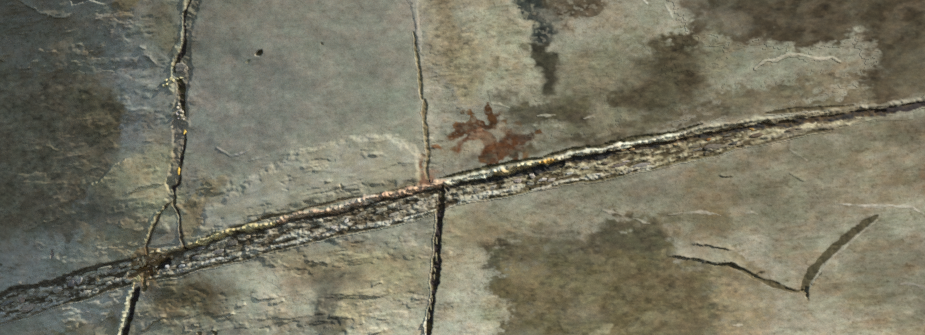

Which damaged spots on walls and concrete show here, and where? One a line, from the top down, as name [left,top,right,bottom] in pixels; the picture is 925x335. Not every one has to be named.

rust [420,100,544,185]
crack [141,0,880,335]
water stain [419,0,925,174]
crack [0,283,141,335]
water stain [272,239,437,335]
water stain [441,204,783,335]